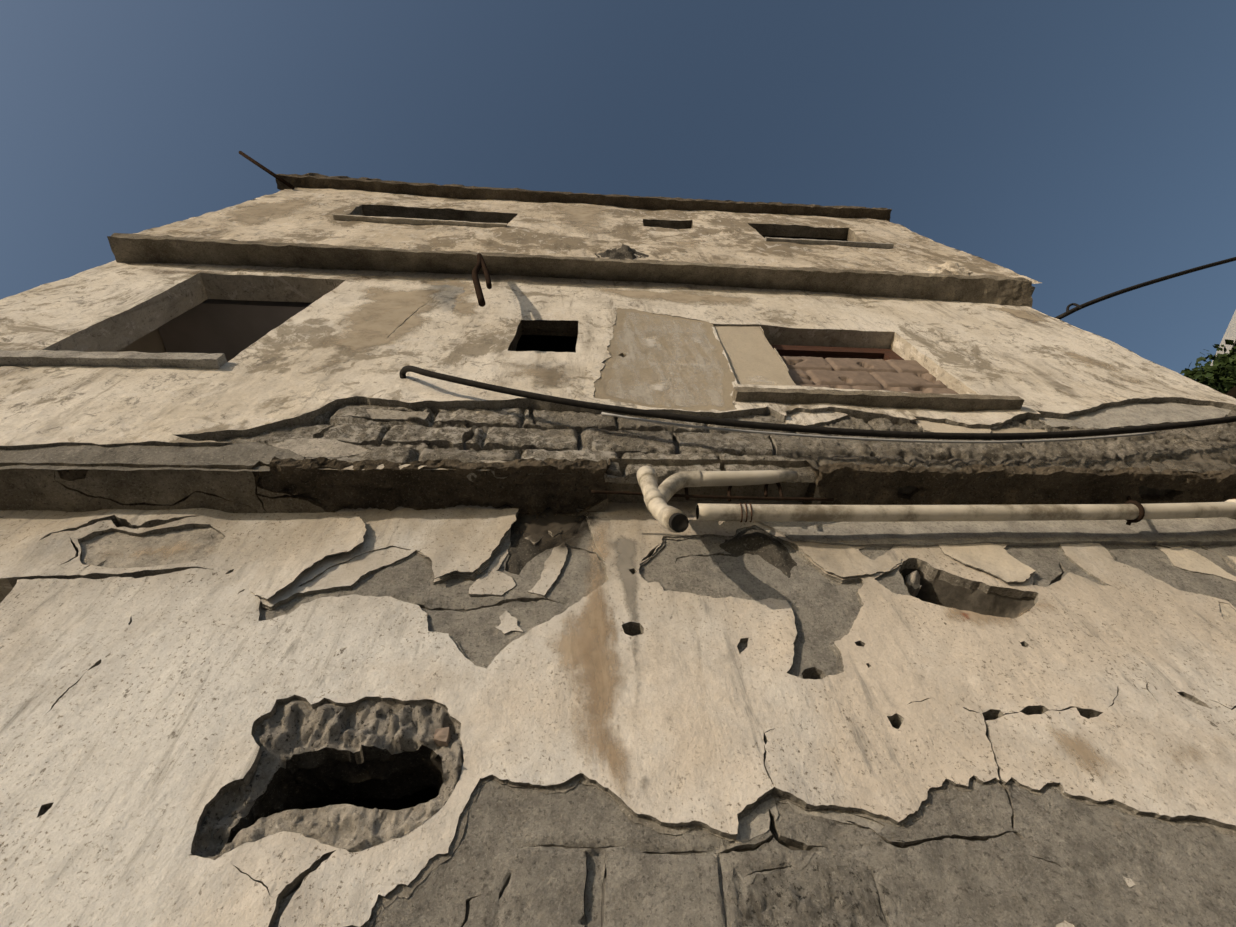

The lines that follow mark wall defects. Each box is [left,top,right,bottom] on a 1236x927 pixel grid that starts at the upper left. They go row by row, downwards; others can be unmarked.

peeling [198,306,1236,679]
peeling [273,887,300,927]
peeling [364,777,1236,927]
crack [893,837,988,848]